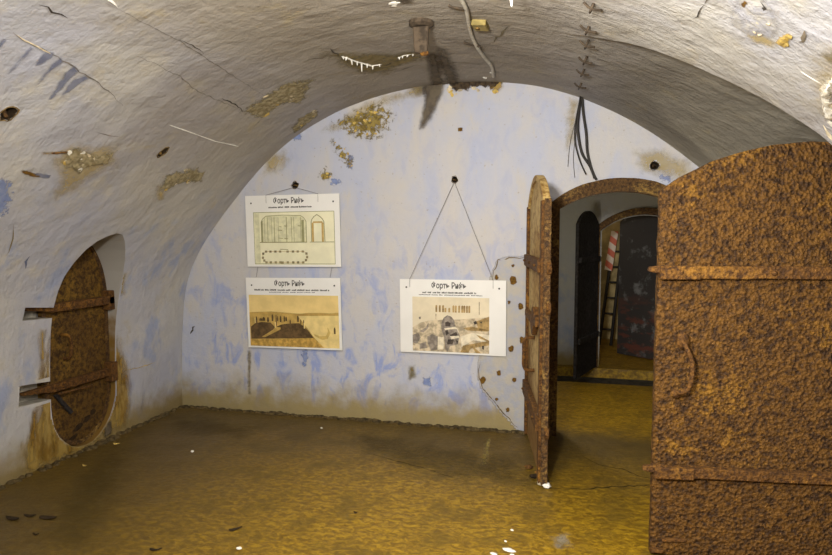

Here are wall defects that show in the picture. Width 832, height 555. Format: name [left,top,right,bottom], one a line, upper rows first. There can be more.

crack [106,0,263,95]
crack [15,34,120,103]
peeling [222,80,314,118]
damp [409,49,457,127]
damp [333,103,393,140]
spalling [61,149,113,190]
peeling [159,168,204,197]
crack [553,456,647,490]